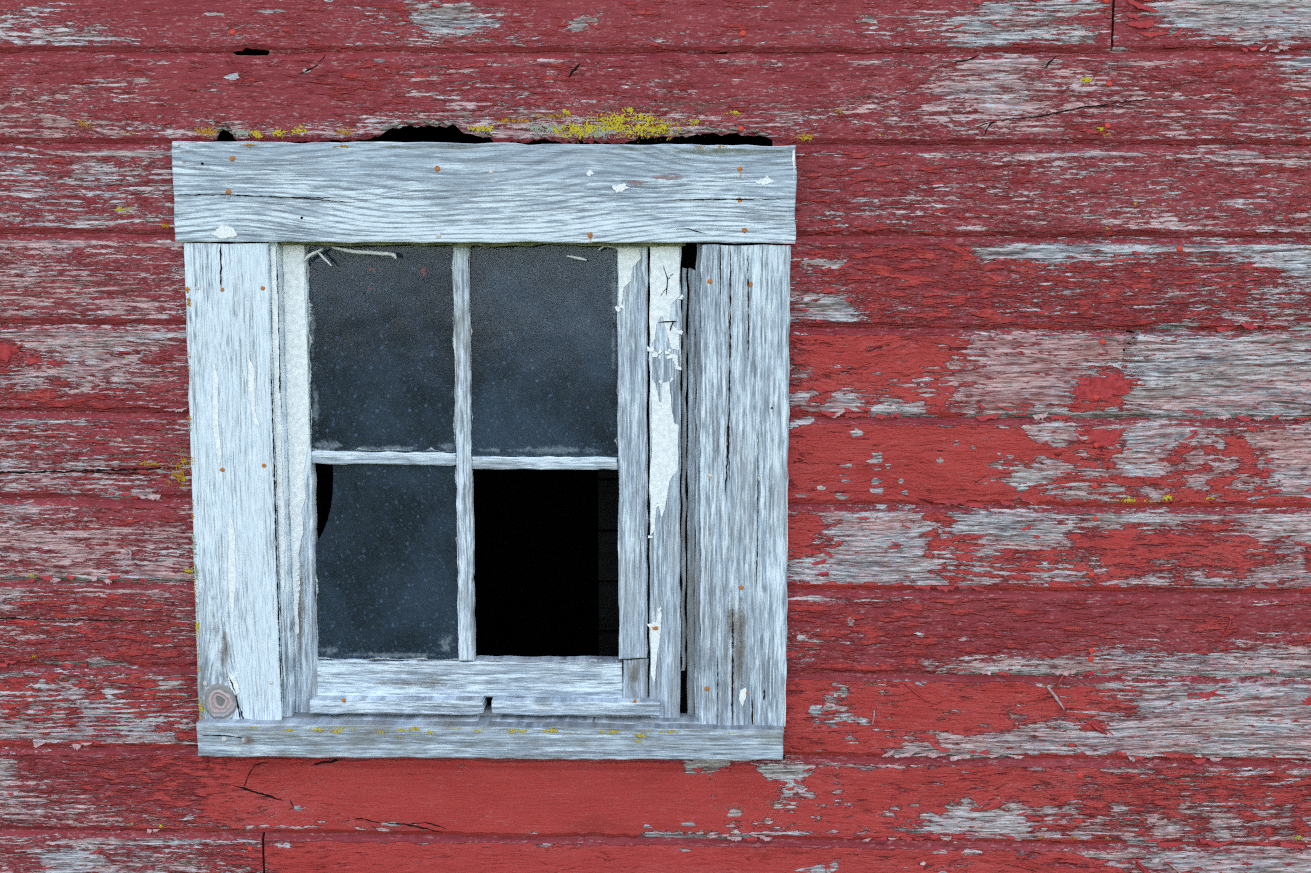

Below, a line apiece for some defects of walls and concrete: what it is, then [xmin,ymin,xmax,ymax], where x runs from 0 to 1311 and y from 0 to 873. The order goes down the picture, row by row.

peeling [952,0,1105,48]
peeling [1125,0,1311,73]
peeling [965,241,1064,264]
peeling [567,246,683,538]
peeling [789,367,924,437]
peeling [933,323,1311,544]
crack [0,466,189,475]
peeling [789,453,917,581]
crack [0,615,180,623]
peeling [882,616,1311,764]
peeling [842,797,1033,865]
peeling [1078,838,1311,873]